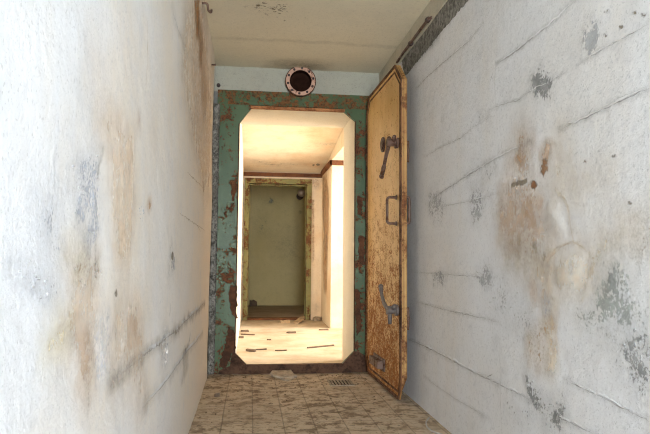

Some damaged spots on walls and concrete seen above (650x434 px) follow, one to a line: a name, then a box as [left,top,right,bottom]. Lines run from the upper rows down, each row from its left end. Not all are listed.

crack [490,2,572,81]
crack [561,87,648,130]
rust [541,145,549,176]
damp [72,155,100,244]
peeling [358,235,366,265]
peeling [228,285,238,318]
crack [109,300,205,387]
peeling [220,327,236,369]
peeling [616,328,650,395]
peeling [525,375,566,432]
crack [567,378,648,421]